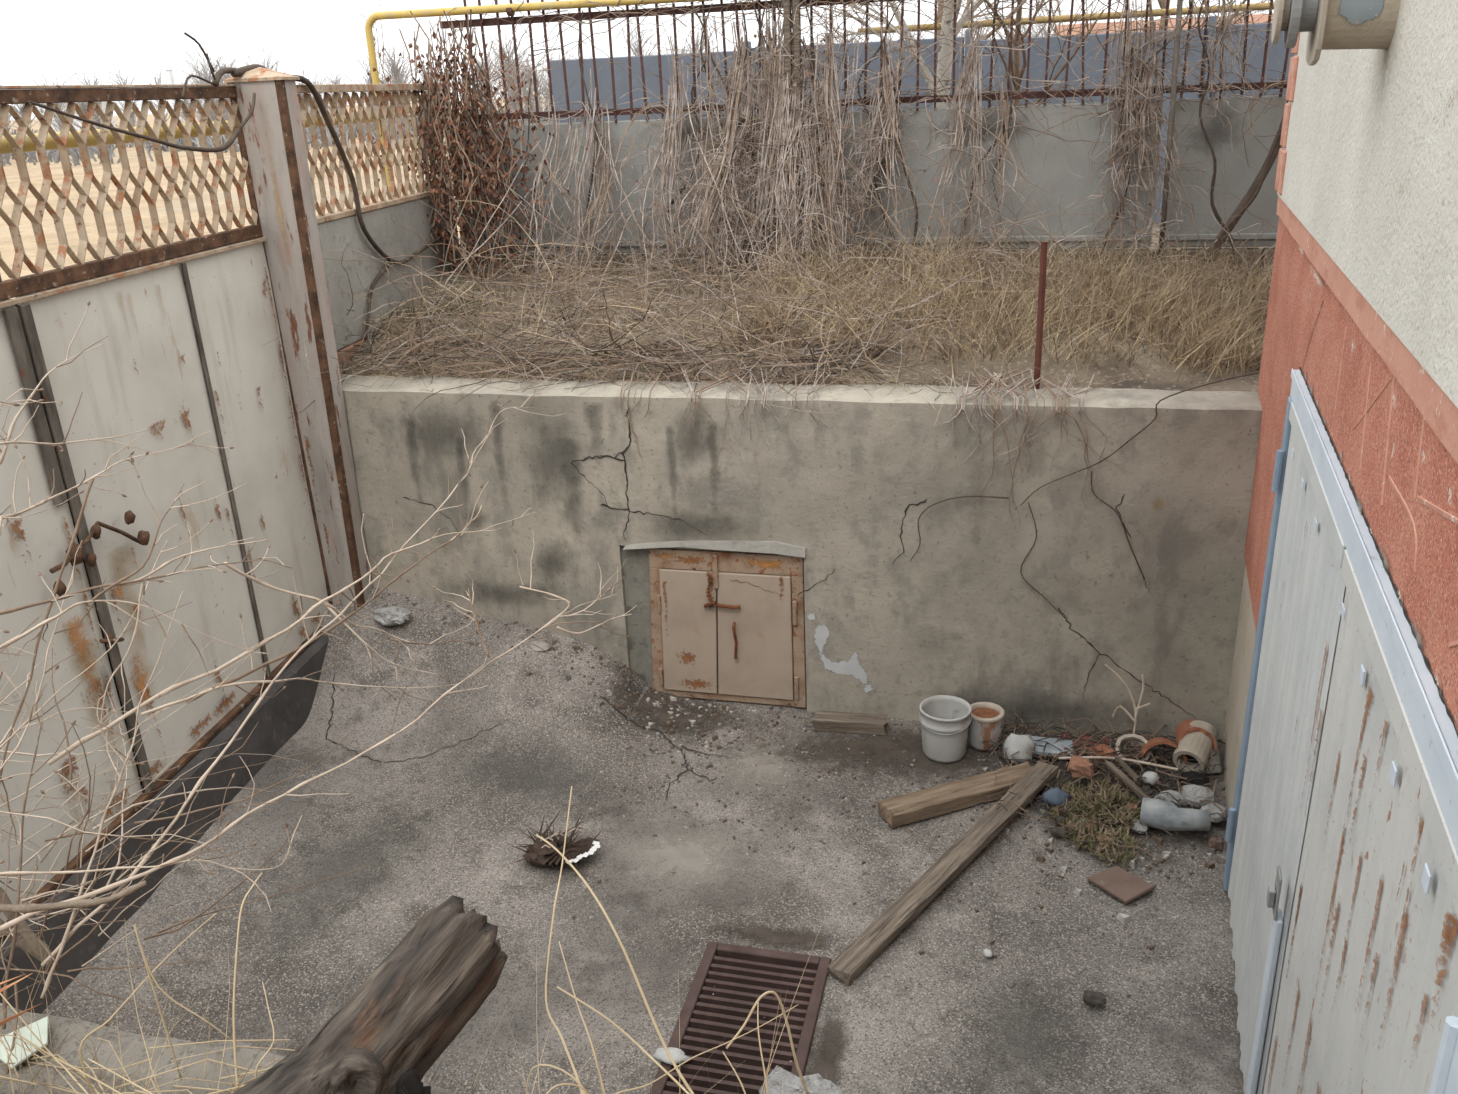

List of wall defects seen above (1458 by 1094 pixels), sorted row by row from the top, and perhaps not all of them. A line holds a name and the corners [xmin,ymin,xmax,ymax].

corrosion [262,267,331,557]
crack [571,408,706,542]
corrosion [66,569,125,742]
corrosion [132,657,165,776]
corrosion [676,650,719,689]
peeling [807,613,873,693]
corrosion [1267,686,1387,1094]
corrosion [1355,817,1424,1049]
corrosion [1413,913,1458,1045]